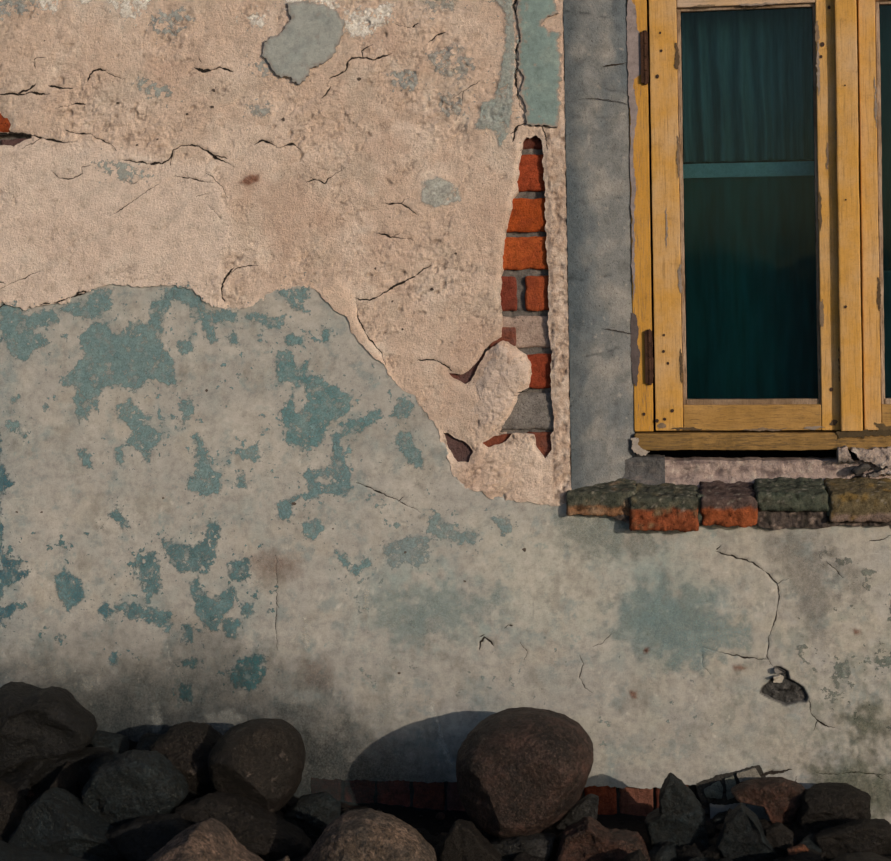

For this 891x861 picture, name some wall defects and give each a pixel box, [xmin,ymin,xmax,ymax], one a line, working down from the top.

crack [0,57,120,108]
crack [194,59,233,73]
peeling [236,0,395,85]
crack [322,44,390,98]
crack [511,0,548,149]
crack [0,130,234,217]
spalling [422,0,563,462]
peeling [0,272,431,632]
peeling [98,508,278,648]
crack [702,545,789,673]
spalling [761,667,807,703]
peeling [797,641,891,719]